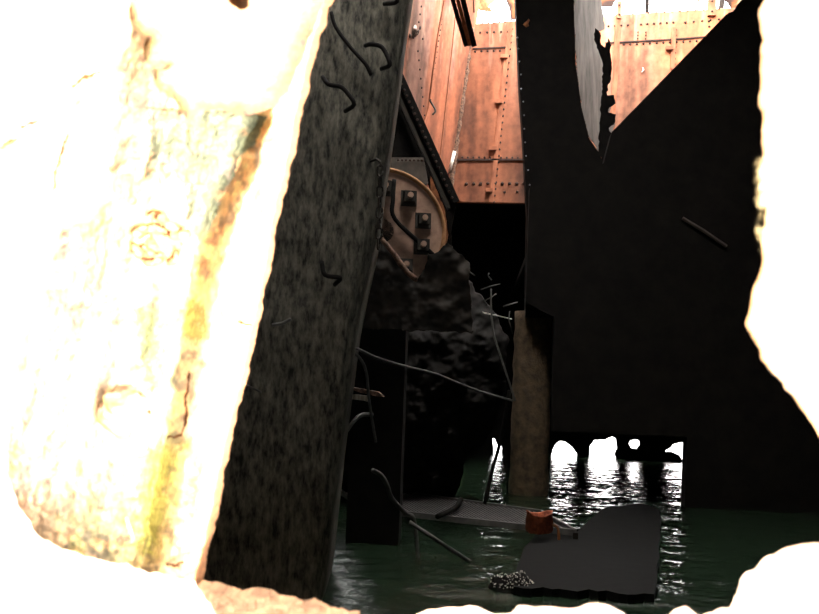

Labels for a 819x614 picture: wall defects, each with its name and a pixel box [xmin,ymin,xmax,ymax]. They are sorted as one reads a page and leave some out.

crack [0,121,38,150]
crack [52,71,108,206]
rust [129,0,325,121]
peeling [594,28,616,161]
peeling [132,243,164,267]
peeling [146,211,169,236]